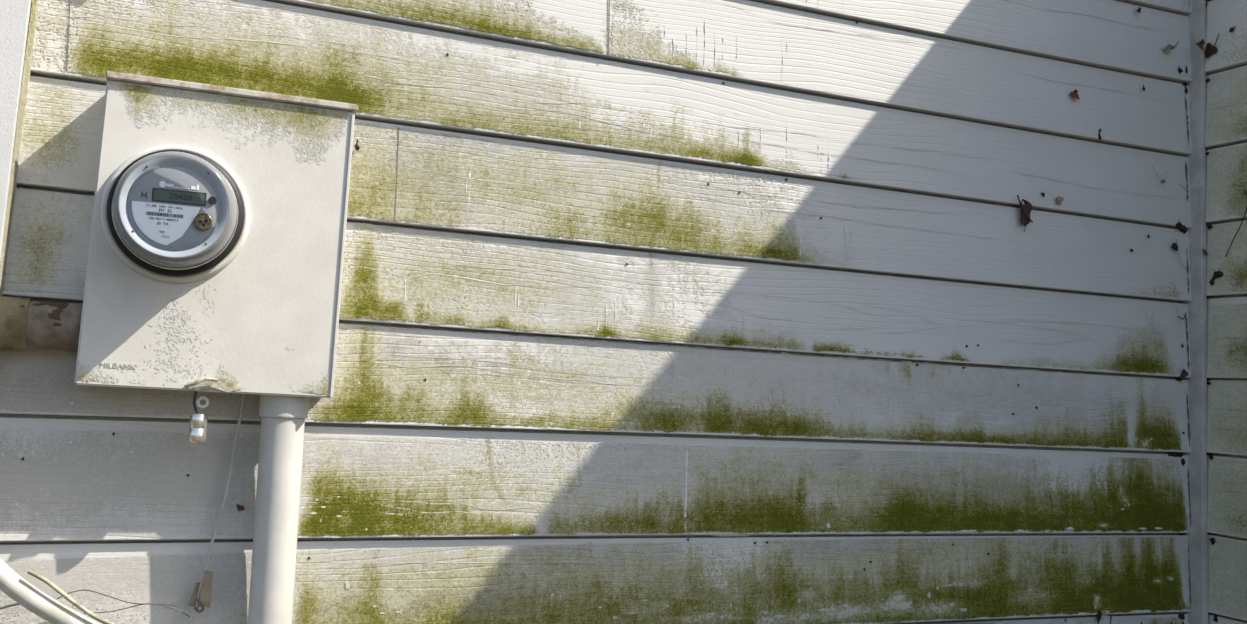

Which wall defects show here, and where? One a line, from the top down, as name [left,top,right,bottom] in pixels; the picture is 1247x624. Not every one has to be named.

leakage [298,127,1189,527]
leakage [1207,8,1247,619]
leakage [0,553,252,624]
leakage [293,537,1160,609]